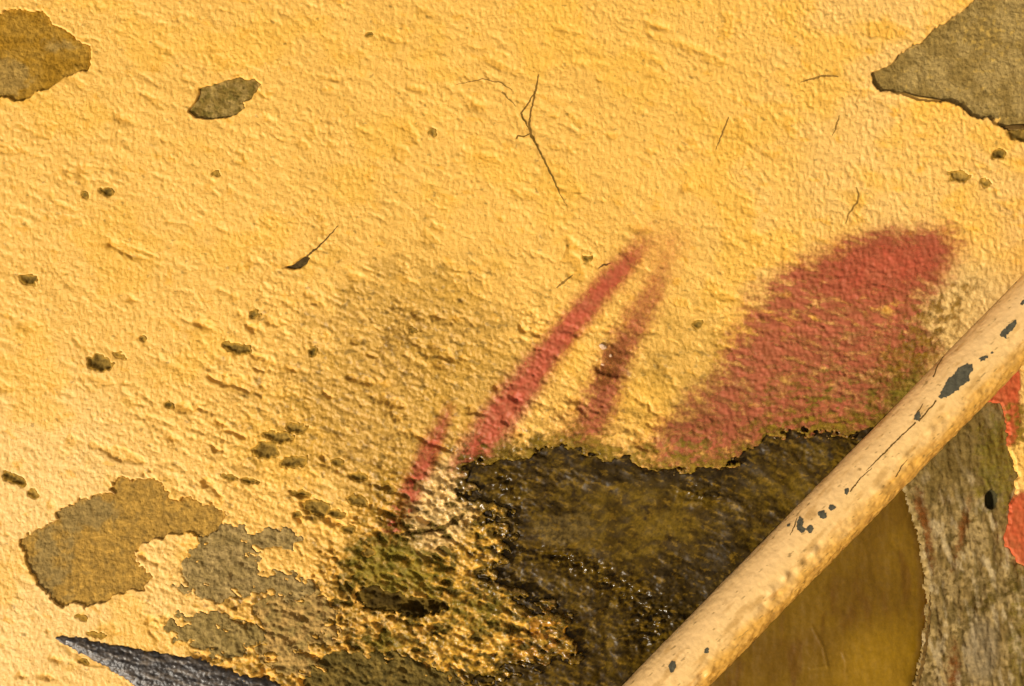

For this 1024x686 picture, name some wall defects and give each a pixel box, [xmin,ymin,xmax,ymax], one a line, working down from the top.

peeling [0,9,92,101]
peeling [189,77,261,119]
crack [456,74,568,208]
peeling [871,0,1024,159]
water stain [1004,403,1024,450]
flaking render [20,422,873,686]
water stain [441,400,885,686]
water stain [710,489,927,686]
spalling [902,402,1024,686]